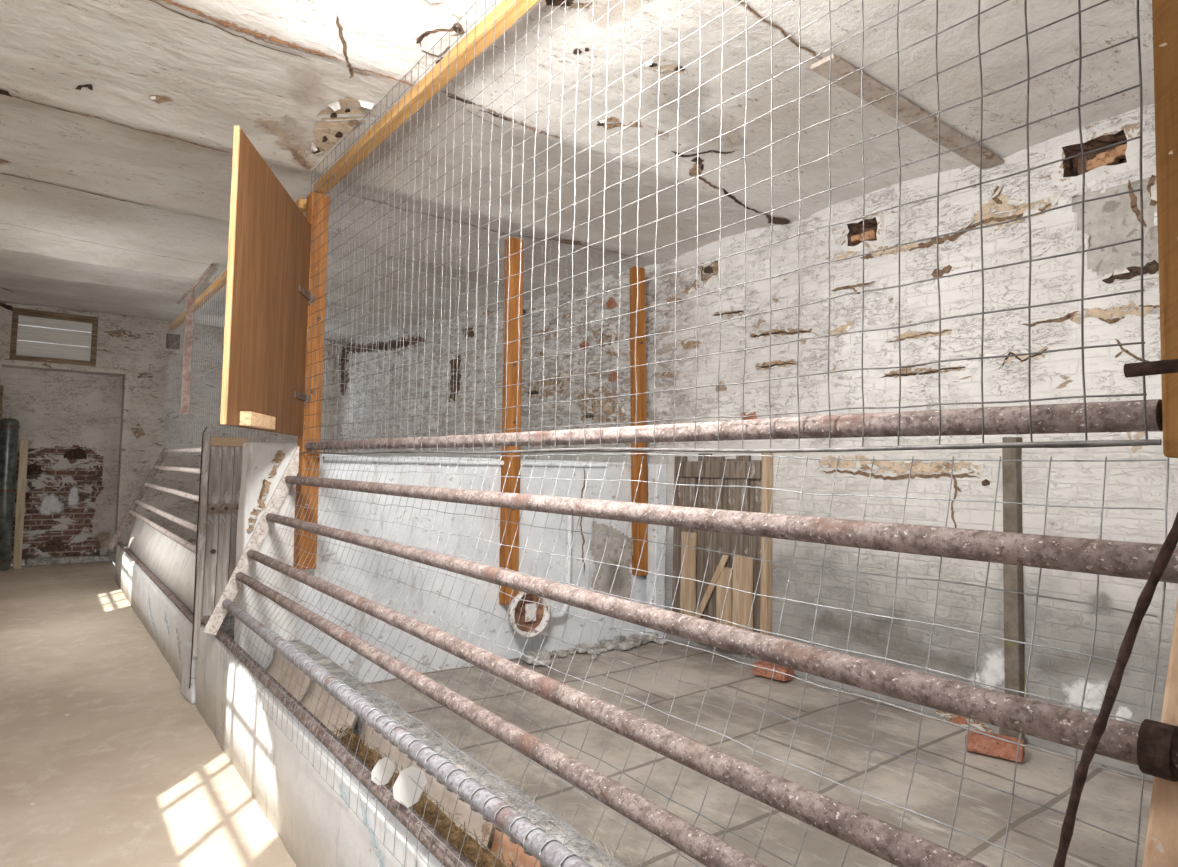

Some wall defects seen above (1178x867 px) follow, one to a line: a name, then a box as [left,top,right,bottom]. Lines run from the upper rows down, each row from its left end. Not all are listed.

crack [336,15,354,78]
peeling [309,96,375,156]
crack [0,159,201,217]
crack [671,150,791,225]
spalling [964,123,1140,231]
spalling [834,212,886,261]
crack [0,288,14,311]
spalling [339,335,426,395]
peeling [819,455,990,486]
flaking render [11,443,104,560]